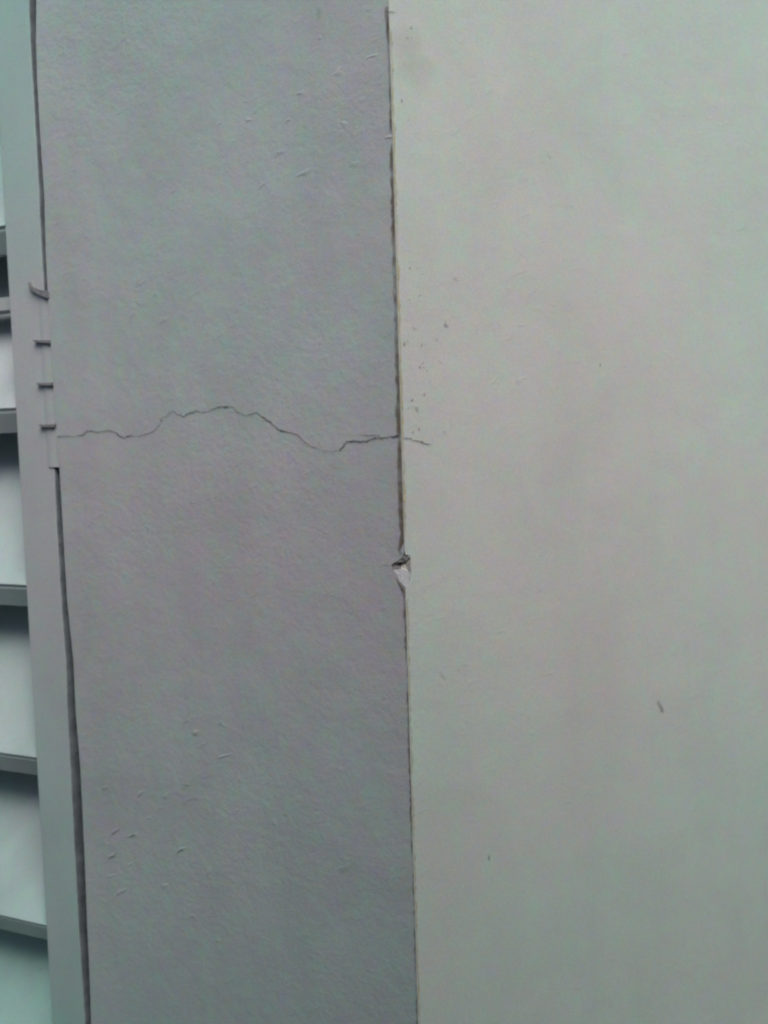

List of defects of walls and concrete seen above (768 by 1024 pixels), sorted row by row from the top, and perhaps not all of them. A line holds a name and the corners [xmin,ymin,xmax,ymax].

spalling [391,554,411,591]